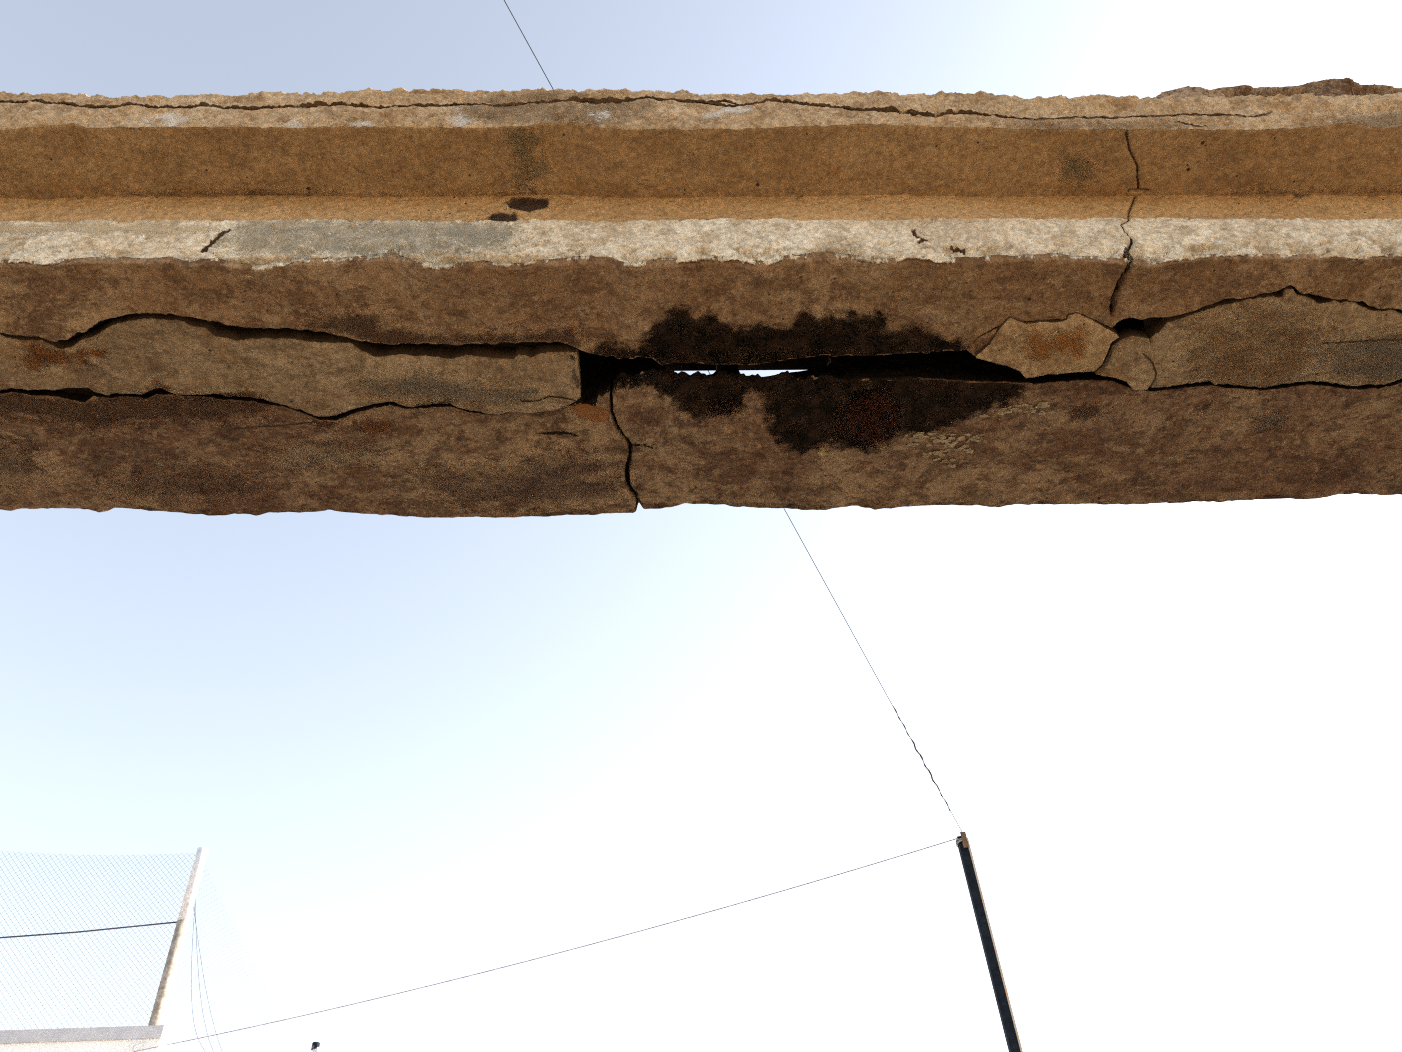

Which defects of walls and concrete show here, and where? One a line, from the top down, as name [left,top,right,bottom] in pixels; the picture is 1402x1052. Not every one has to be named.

crack [0,95,1272,313]
crack [72,319,108,337]
crack [217,321,252,329]
crack [422,341,543,349]
crack [1143,317,1158,384]
crack [1323,337,1402,345]
leakage [572,308,1026,455]
crack [40,388,97,396]
crack [234,421,318,429]
crack [520,373,653,498]